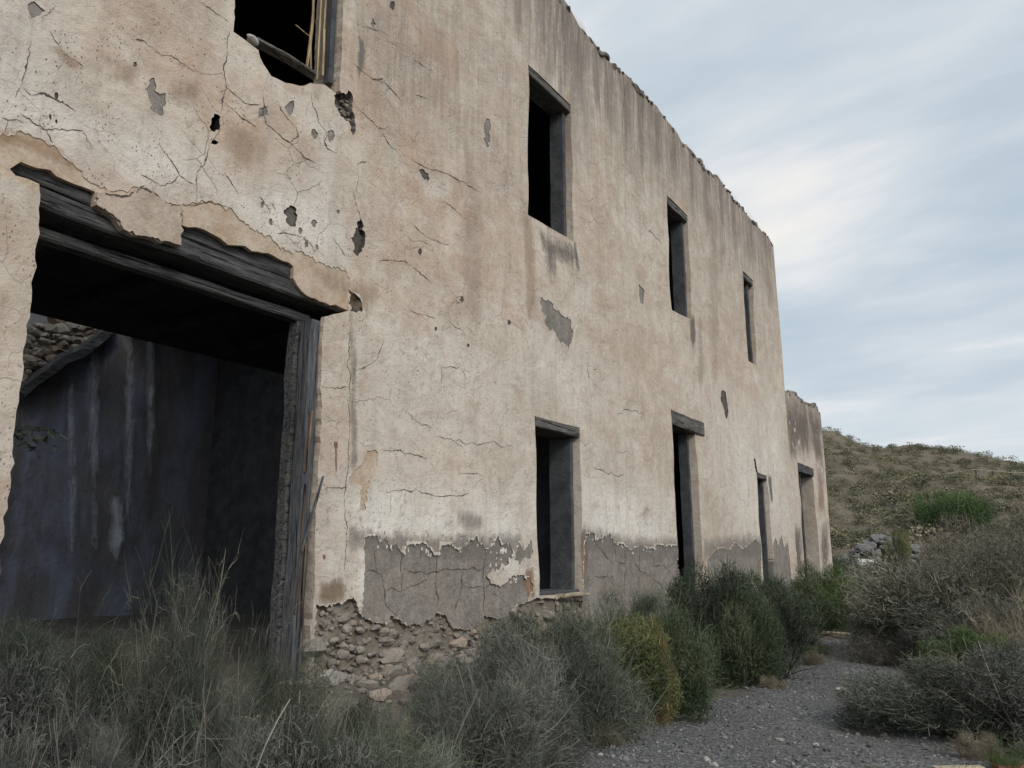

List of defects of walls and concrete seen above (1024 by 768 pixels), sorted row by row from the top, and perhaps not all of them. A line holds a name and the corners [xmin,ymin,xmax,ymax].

crack [1,33,93,148]
peeling [0,131,152,213]
crack [105,5,346,256]
spalling [334,90,356,135]
crack [356,107,477,214]
peeling [168,200,363,313]
spalling [351,218,366,256]
damp [542,235,578,266]
crack [324,319,492,615]
crack [383,416,513,459]
spalling [353,531,534,630]
spalling [581,533,680,629]